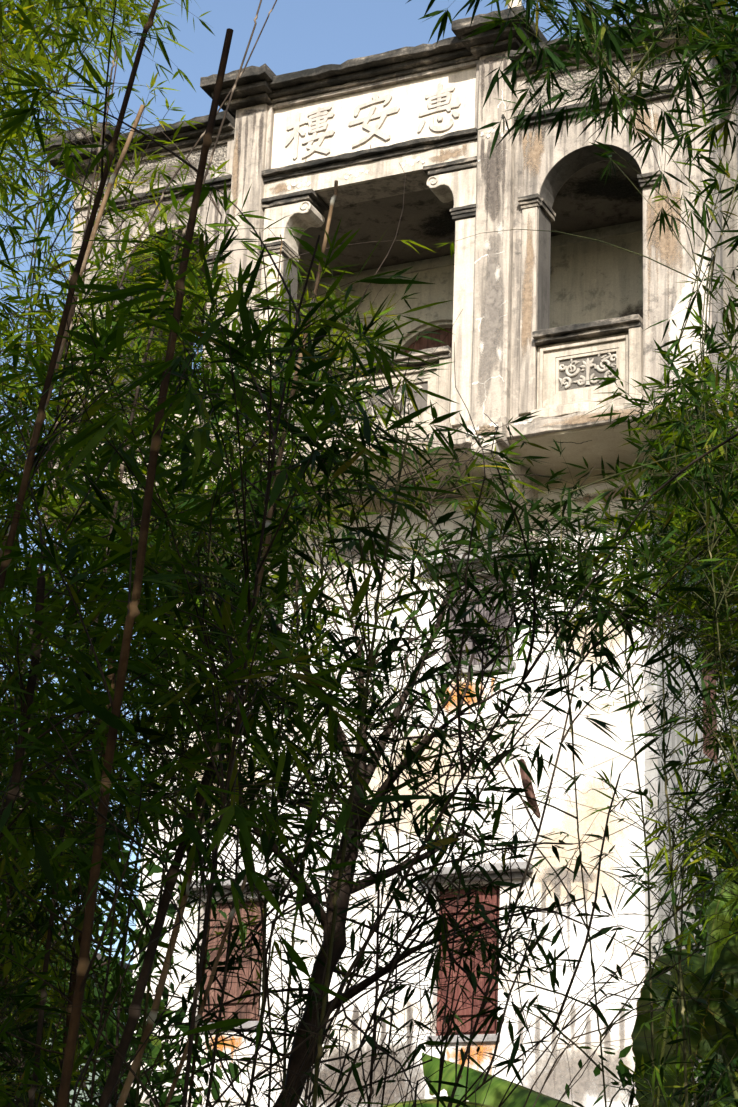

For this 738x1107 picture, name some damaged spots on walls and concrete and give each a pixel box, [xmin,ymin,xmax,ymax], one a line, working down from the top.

leakage [519,114,610,173]
leakage [623,107,662,135]
leakage [479,133,506,402]
leakage [521,226,534,346]
leakage [566,168,682,279]
leakage [620,303,649,319]
leakage [535,791,624,947]